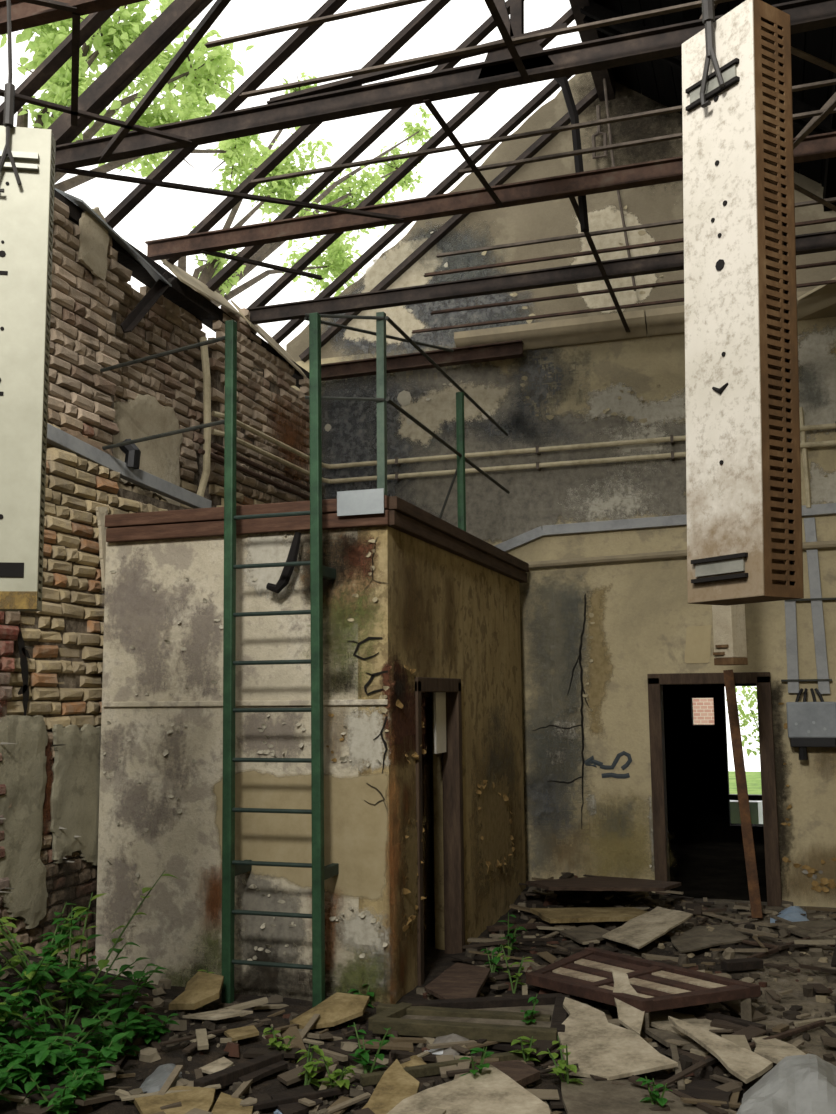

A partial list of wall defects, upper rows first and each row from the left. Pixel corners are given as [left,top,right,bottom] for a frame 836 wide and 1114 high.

water stain [321,378,377,499]
water stain [327,292,536,359]
water stain [414,229,500,285]
peeling [321,362,687,542]
peeling [571,205,660,265]
peeling [576,274,663,313]
peeling [798,325,836,441]
crack [347,637,388,812]
water stain [524,582,652,877]